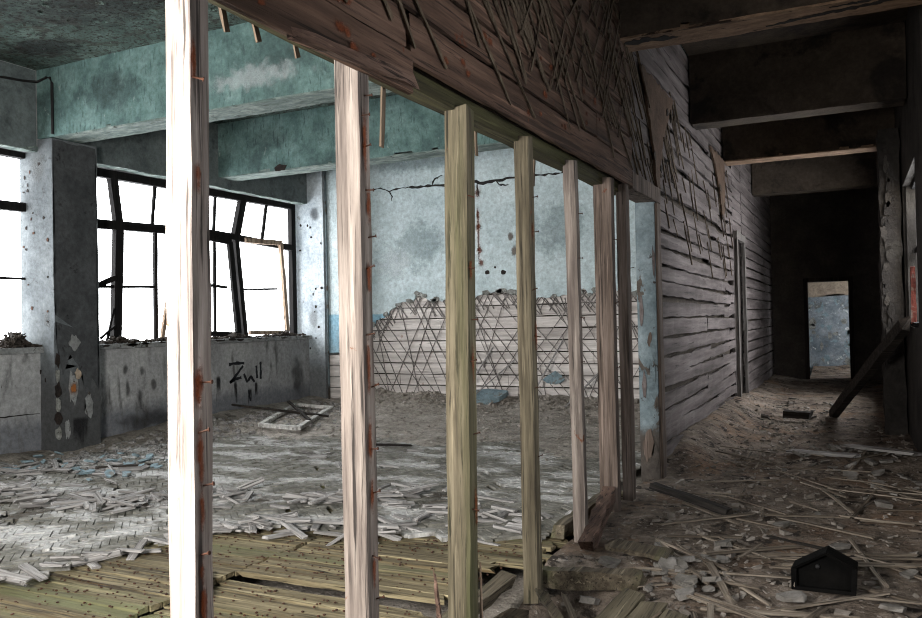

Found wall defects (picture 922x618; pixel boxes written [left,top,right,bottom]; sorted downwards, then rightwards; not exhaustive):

crack [374,175,444,201]
crack [475,172,563,196]
corrosion [195,367,203,408]
spalling [373,291,446,394]
spalling [475,288,519,396]
spalling [536,294,570,396]
spalling [581,287,598,398]
peeling [631,290,659,468]